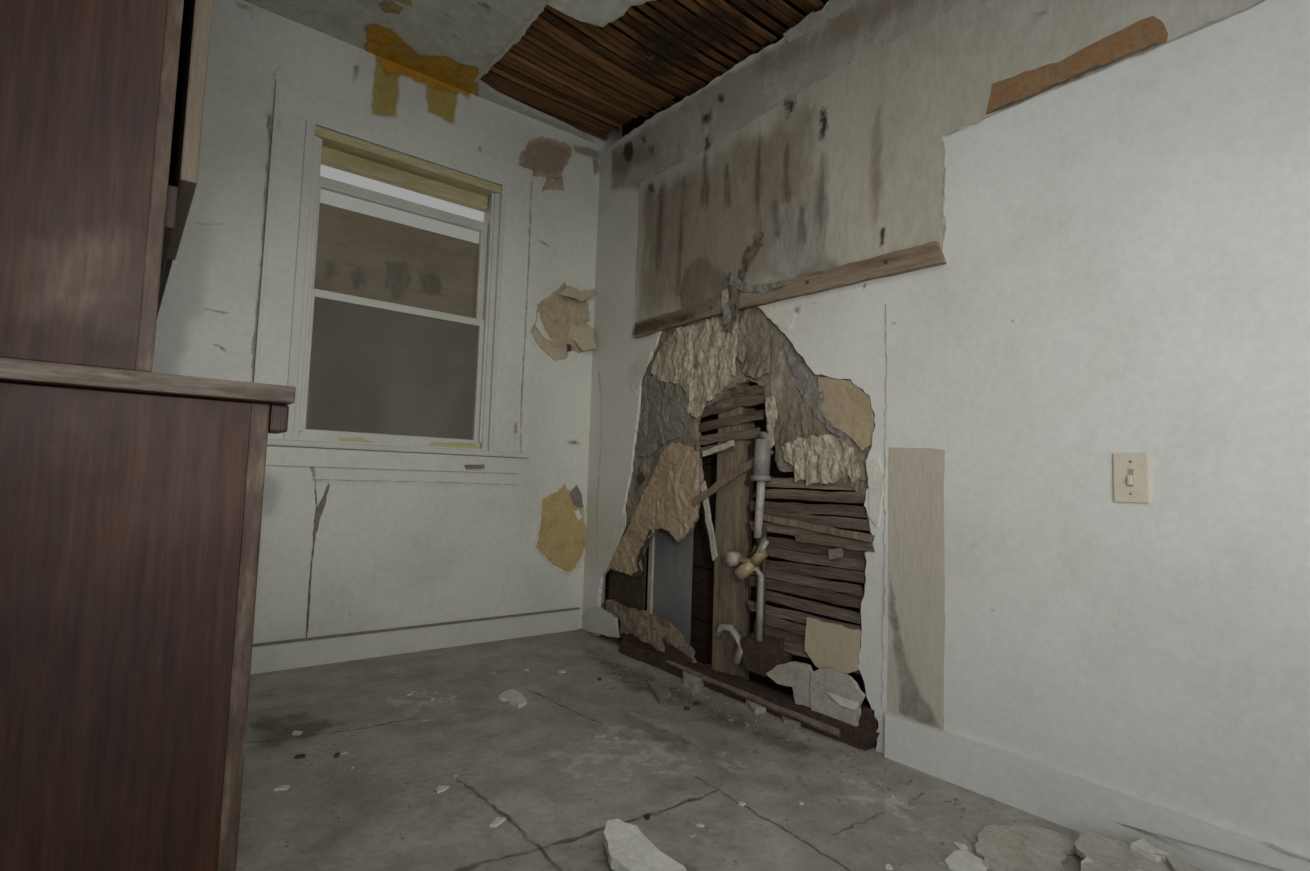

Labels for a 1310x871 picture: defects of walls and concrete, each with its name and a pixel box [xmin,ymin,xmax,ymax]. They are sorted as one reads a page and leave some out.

spalling [473,0,853,140]
peeling [518,136,572,192]
leakage [577,39,833,308]
peeling [530,282,597,361]
spalling [608,305,884,577]
crack [306,467,512,638]
spalling [534,484,587,576]
crack [456,762,716,871]